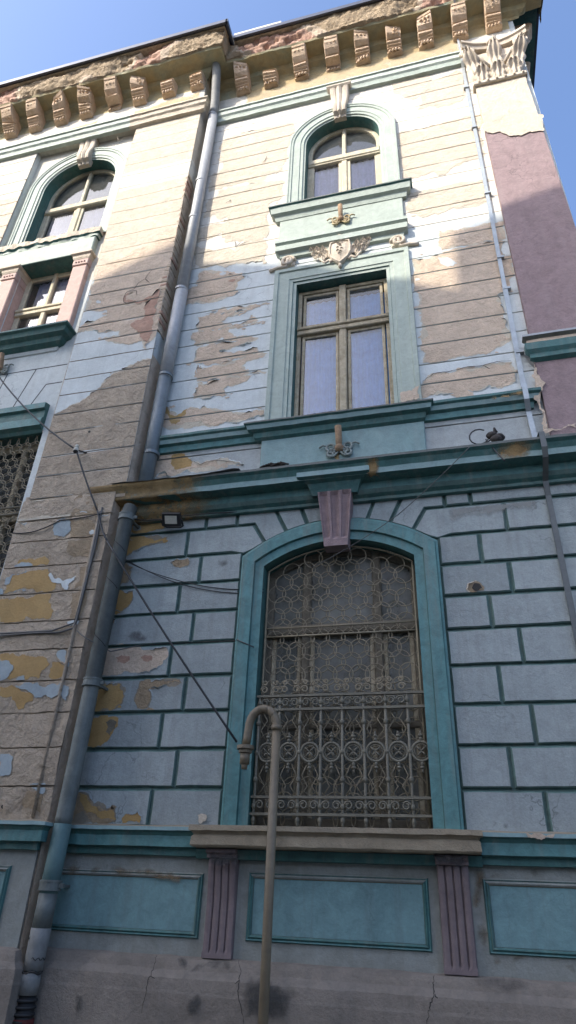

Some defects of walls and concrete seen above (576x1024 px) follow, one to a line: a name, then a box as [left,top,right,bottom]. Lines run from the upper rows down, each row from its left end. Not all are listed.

peeling [163,122,295,430]
peeling [400,221,518,402]
peeling [0,174,194,626]
rust [90,476,201,525]
peeling [0,650,69,710]
flaking render [88,643,181,747]
peeling [72,790,143,824]